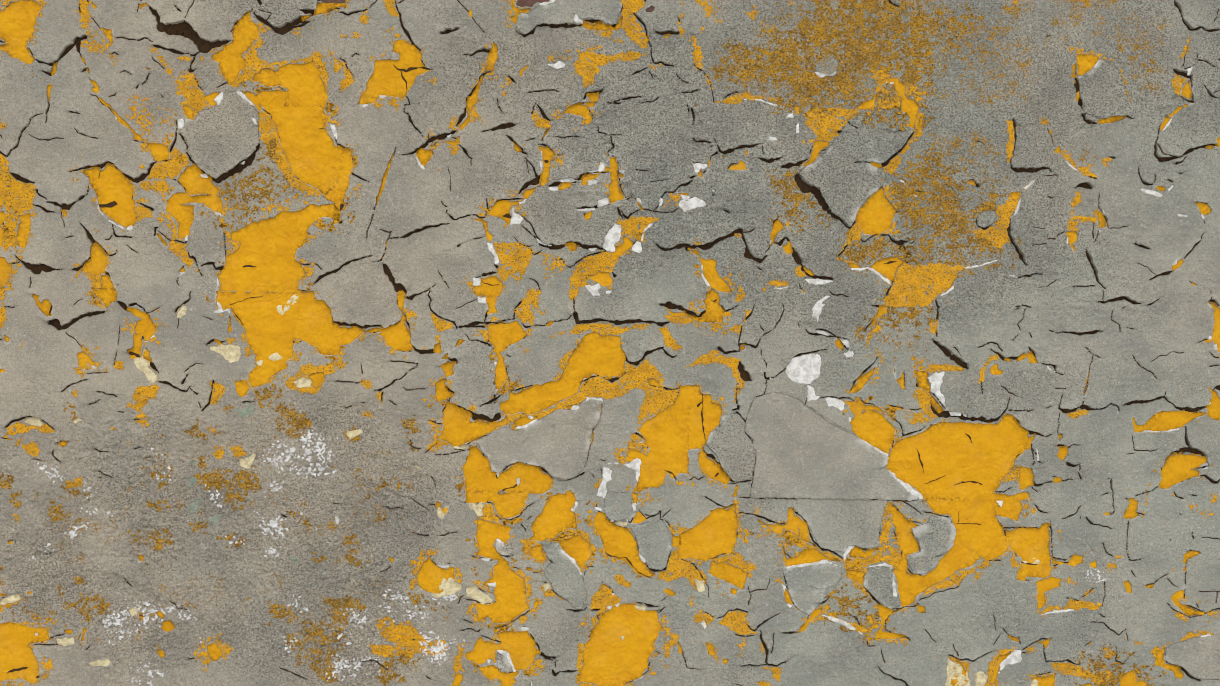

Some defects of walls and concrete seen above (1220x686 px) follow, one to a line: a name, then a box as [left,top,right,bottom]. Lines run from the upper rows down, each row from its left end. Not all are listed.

peeling [0,0,46,76]
peeling [358,27,437,111]
peeling [69,10,417,397]
peeling [471,92,644,264]
peeling [744,69,927,241]
peeling [666,237,736,336]
crack [1,416,64,462]
peeling [408,267,1097,686]
peeling [1104,387,1220,519]
peeling [0,614,87,686]
crack [7,634,90,678]
peeling [1107,590,1220,686]